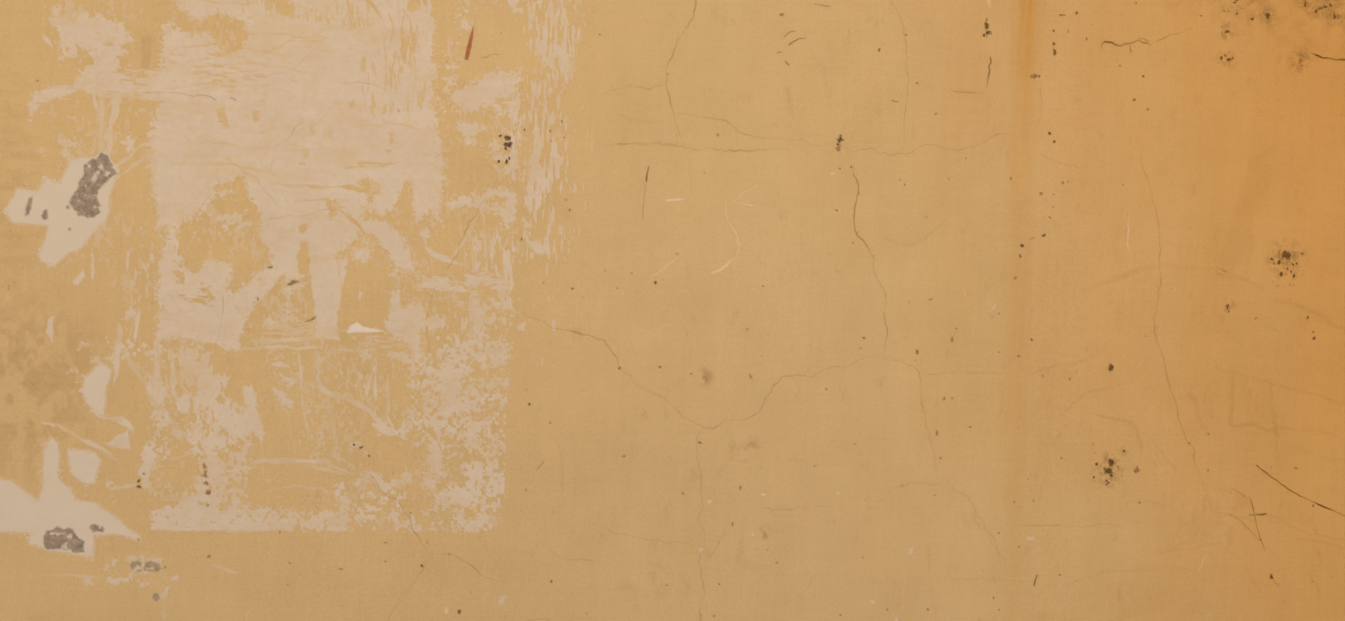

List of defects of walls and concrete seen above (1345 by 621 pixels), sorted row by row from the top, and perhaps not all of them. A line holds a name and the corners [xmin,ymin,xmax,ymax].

crack [1101,28,1194,53]
mould [1215,0,1280,69]
mould [1296,0,1345,31]
crack [1310,52,1345,62]
peeling [0,0,604,621]
crack [514,0,1011,621]